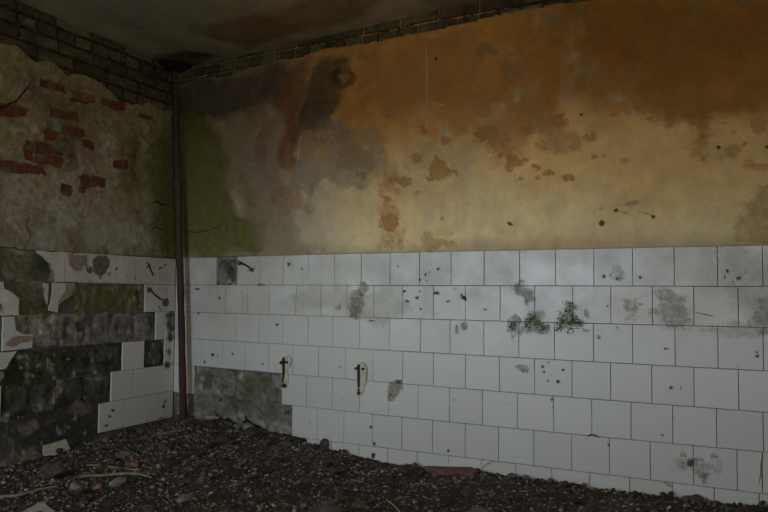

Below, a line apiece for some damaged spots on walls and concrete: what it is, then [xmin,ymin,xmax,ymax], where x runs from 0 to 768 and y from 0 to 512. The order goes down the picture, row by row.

crack [0,77,35,108]
spalling [0,103,129,176]
spalling [0,0,587,121]
water stain [294,58,365,176]
spalling [60,176,106,196]
peeling [0,255,379,471]
spalling [452,466,642,499]
spalling [652,491,766,511]